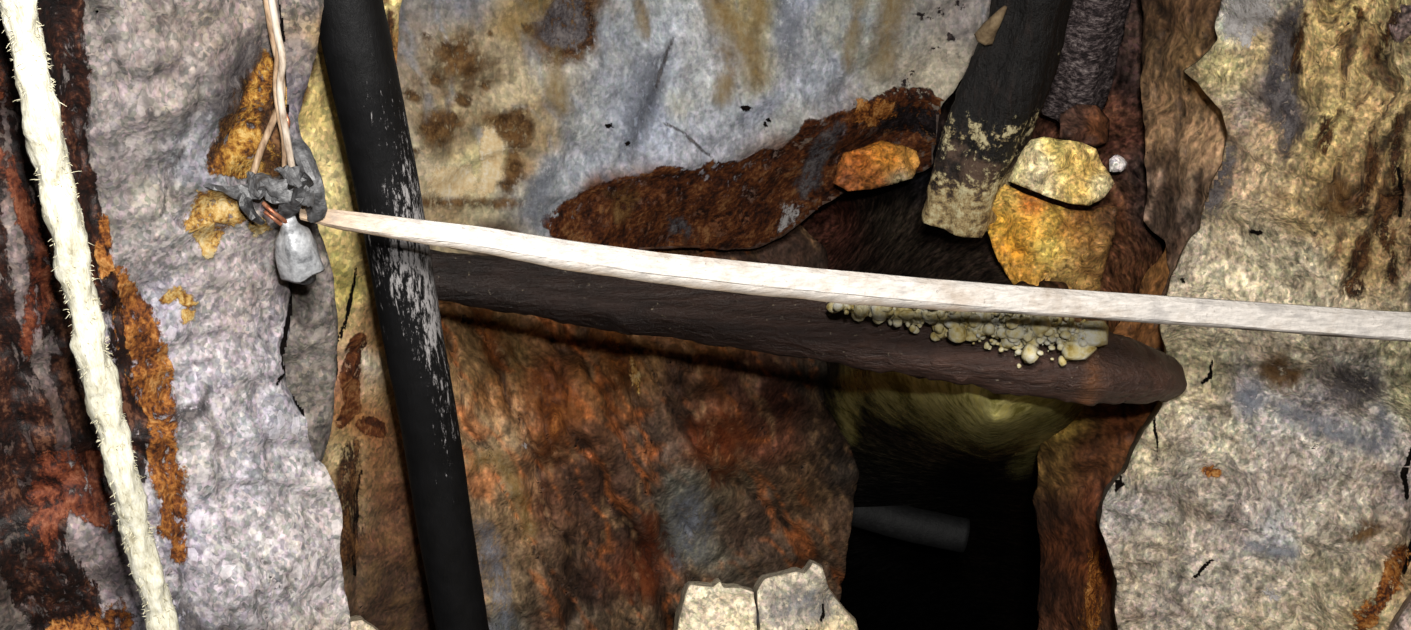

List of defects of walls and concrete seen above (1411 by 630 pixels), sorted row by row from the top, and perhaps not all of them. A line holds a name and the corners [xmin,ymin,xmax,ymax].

rust [541,86,944,250]
rust [0,11,137,630]
rust [37,0,188,565]
crack [1400,447,1411,500]
rust [1351,522,1380,541]
rust [1352,543,1411,630]
crack [1402,539,1411,574]